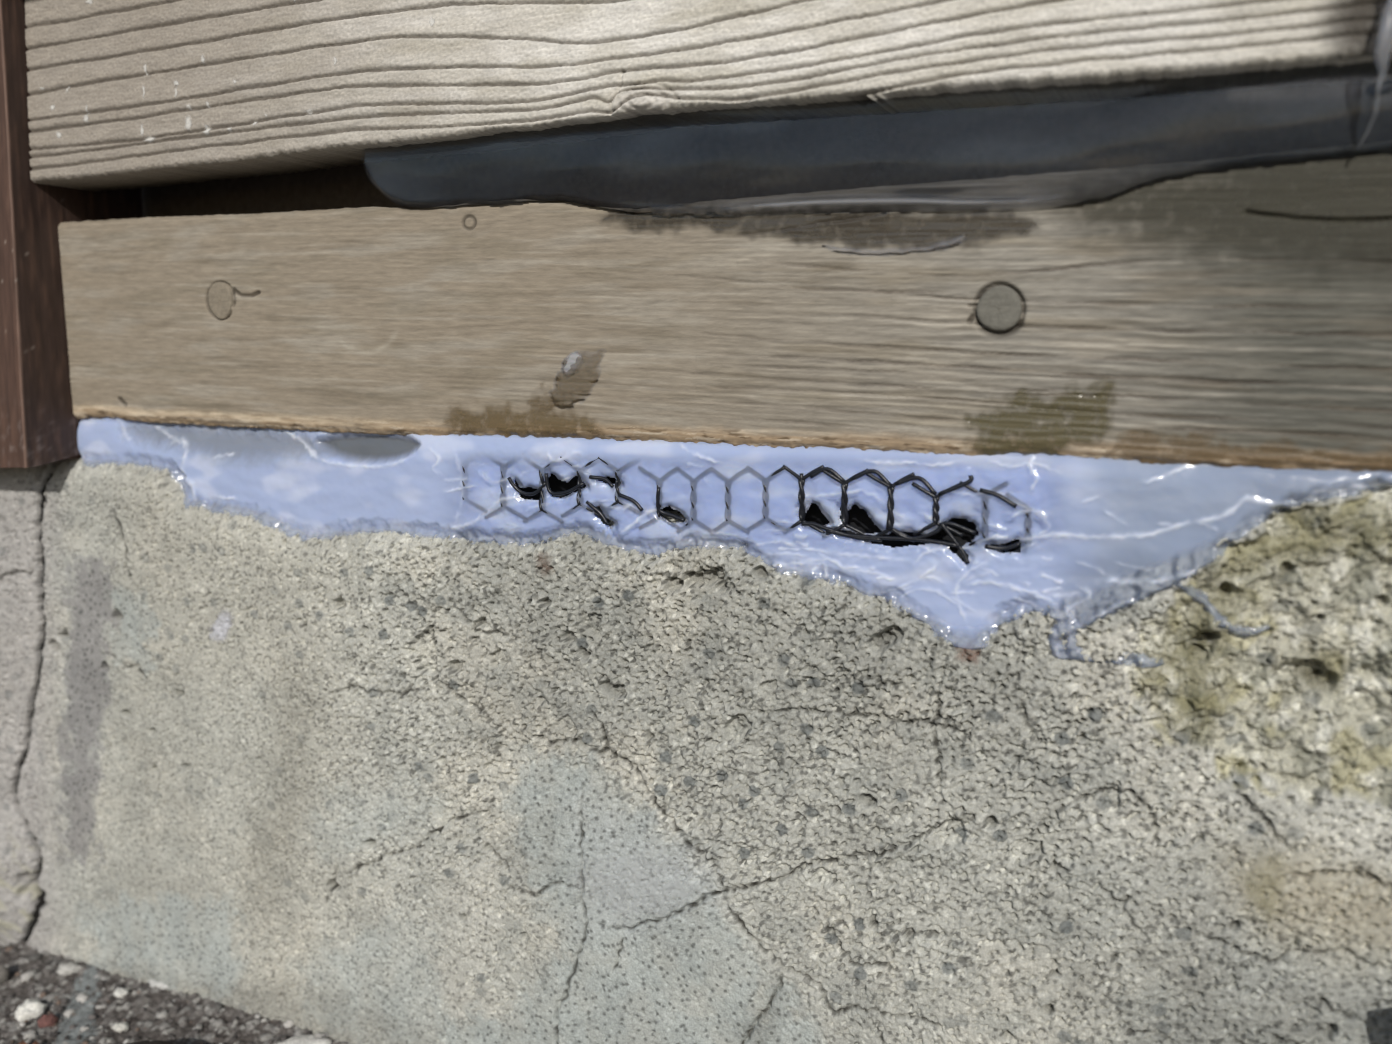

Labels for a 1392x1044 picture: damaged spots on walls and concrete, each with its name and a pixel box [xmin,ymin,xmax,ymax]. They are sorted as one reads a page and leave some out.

crack [10,474,53,942]
crack [327,814,468,899]
crack [532,714,945,1044]
crack [847,693,957,781]
spalling [1126,480,1392,806]
crack [1240,794,1387,886]